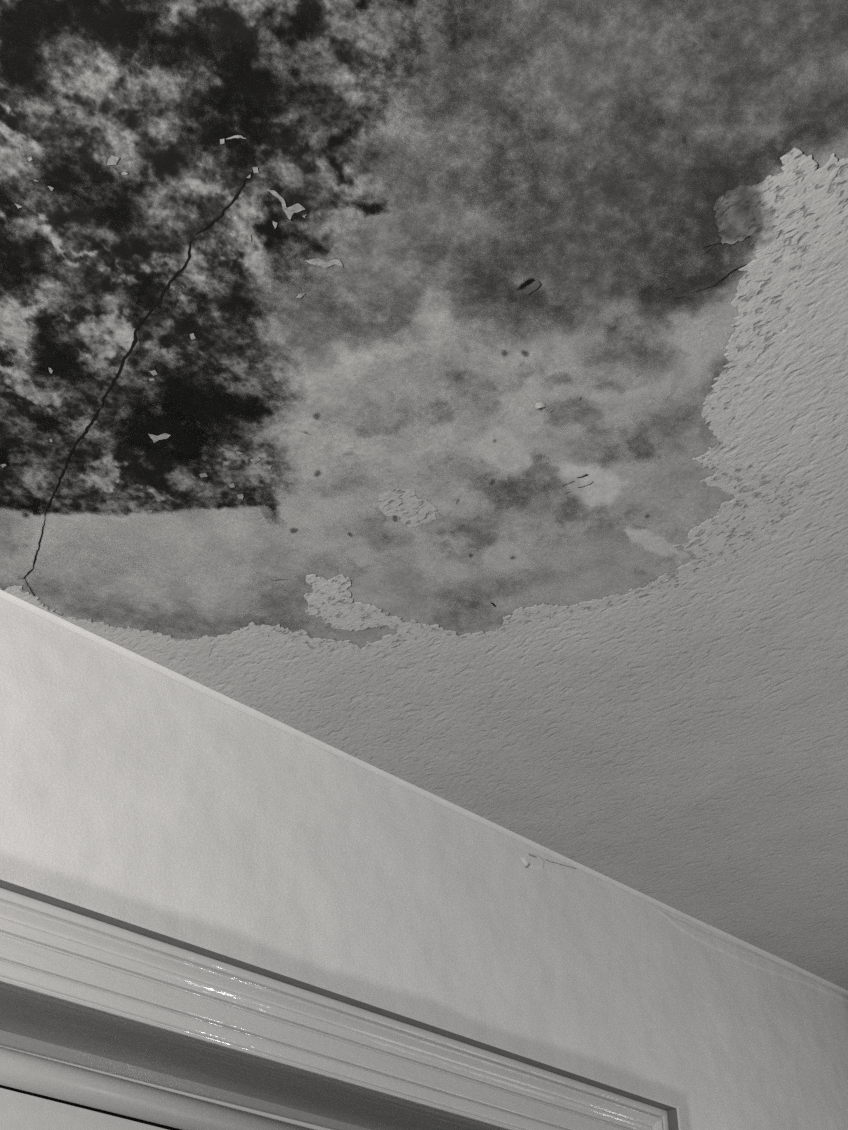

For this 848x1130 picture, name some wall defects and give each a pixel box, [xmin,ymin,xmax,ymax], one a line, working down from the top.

crack [22,166,256,597]
leakage [0,0,431,517]
peeling [0,0,848,653]
leakage [541,49,701,157]
leakage [504,149,785,324]
leakage [642,0,804,99]